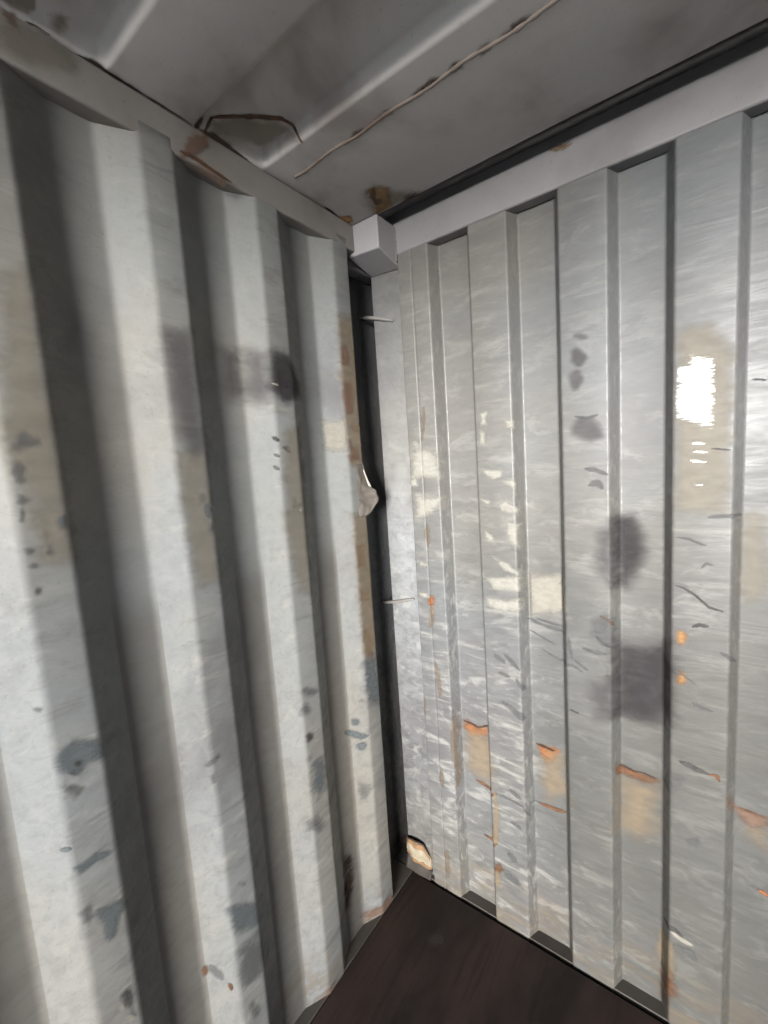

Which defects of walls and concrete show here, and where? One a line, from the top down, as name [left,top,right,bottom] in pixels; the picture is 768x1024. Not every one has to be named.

corrosion [77,54,302,186]
corrosion [368,187,420,214]
damp [615,518,643,581]
damp [617,648,671,720]
corrosion [464,721,489,736]
corrosion [536,743,559,761]
corrosion [616,765,658,782]